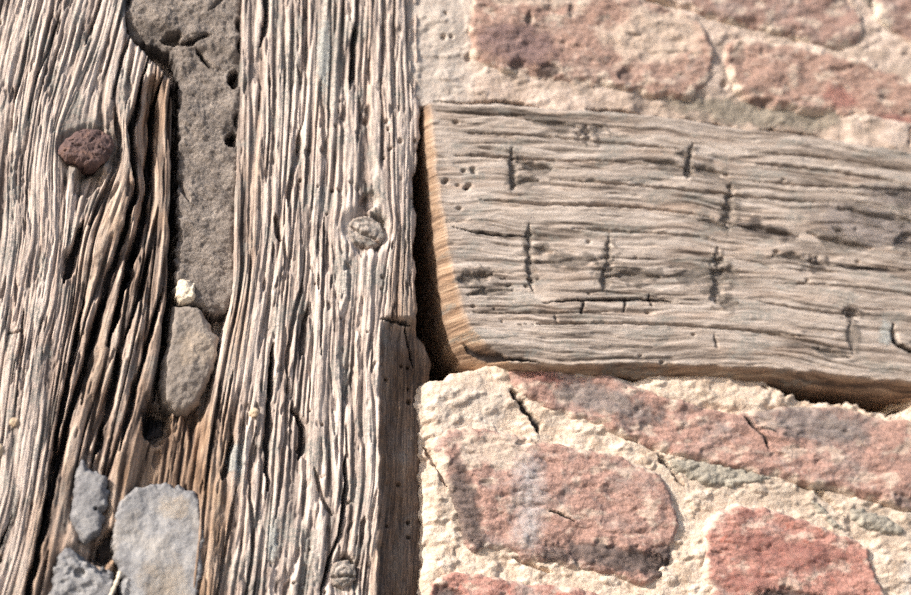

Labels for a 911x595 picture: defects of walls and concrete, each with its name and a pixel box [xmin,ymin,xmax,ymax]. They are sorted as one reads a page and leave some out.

crack [510,393,538,432]
crack [746,419,776,446]